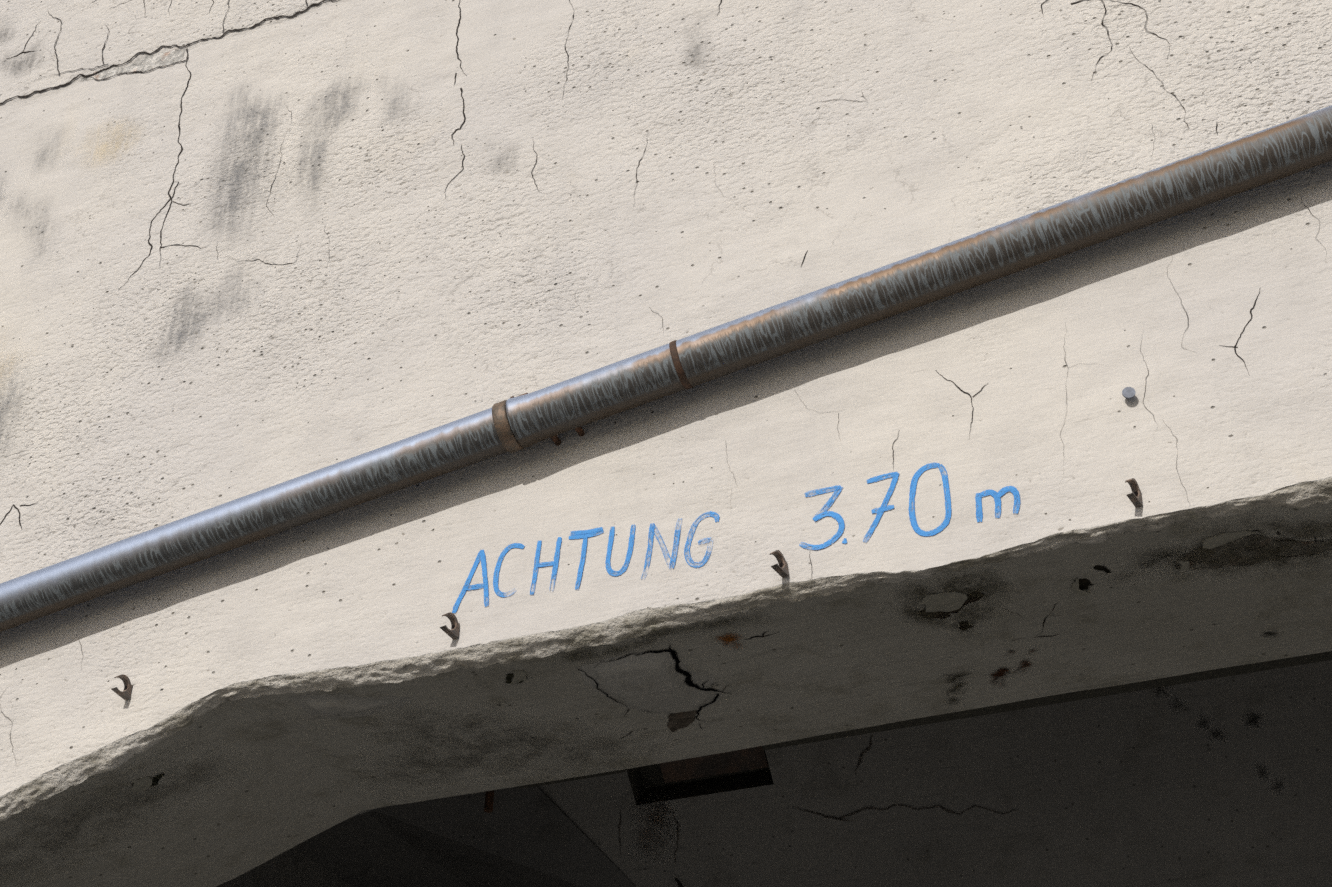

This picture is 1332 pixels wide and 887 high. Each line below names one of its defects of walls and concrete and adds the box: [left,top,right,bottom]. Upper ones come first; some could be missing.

crack [0,0,337,288]
crack [444,1,467,198]
crack [1041,0,1218,132]
crack [1220,289,1260,371]
spalling [918,592,983,630]
crack [579,645,739,740]
crack [795,805,1019,821]